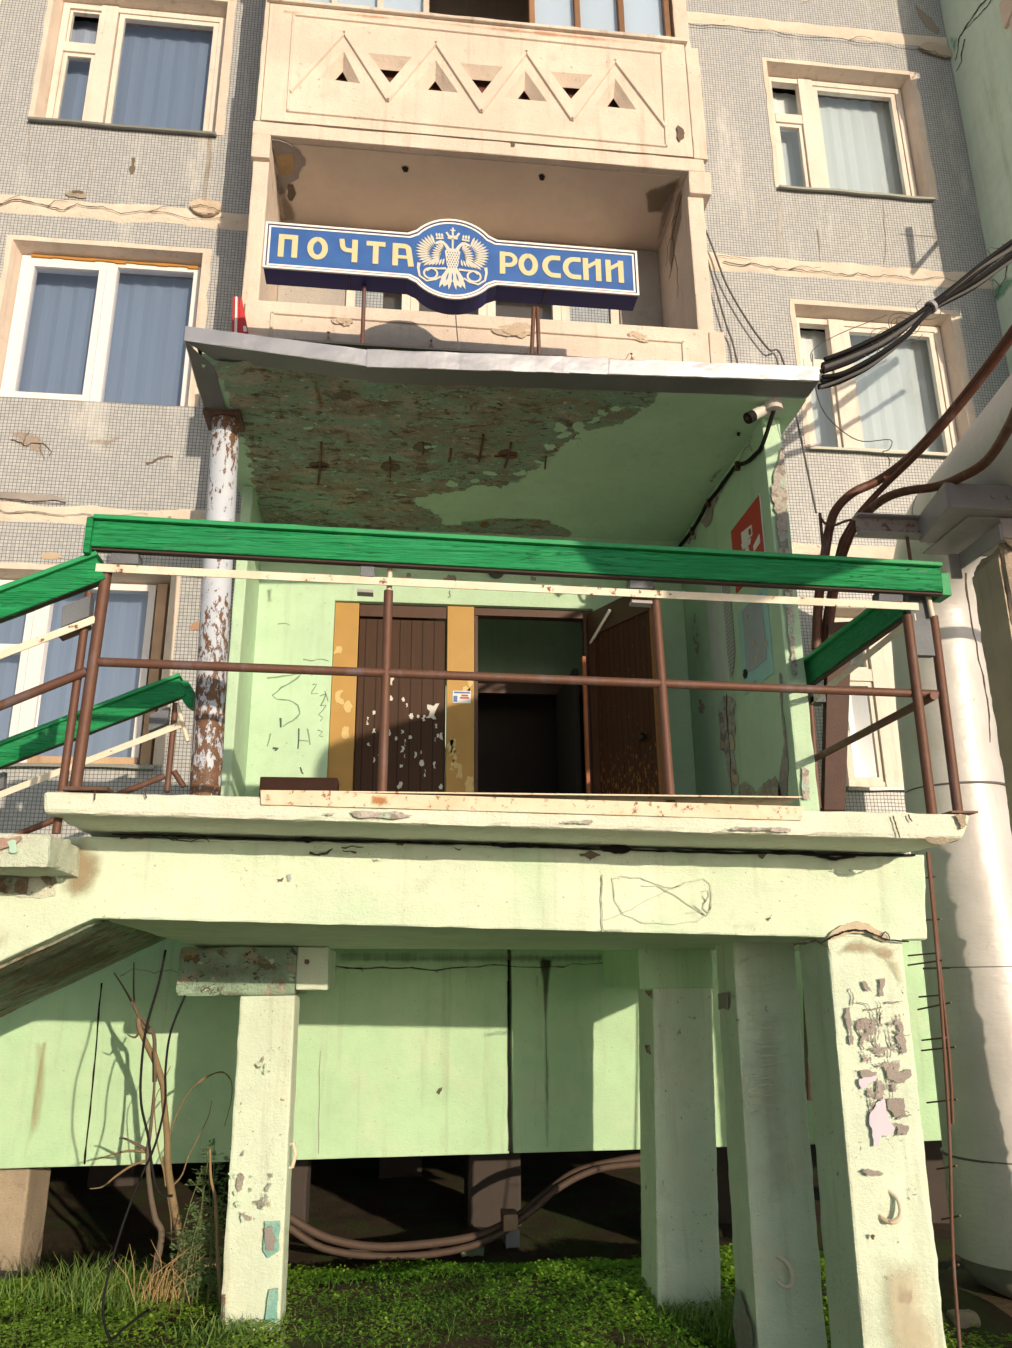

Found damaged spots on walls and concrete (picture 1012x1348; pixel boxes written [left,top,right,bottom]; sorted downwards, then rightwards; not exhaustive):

spalling [272,139,305,201]
peeling [214,360,659,537]
peeling [771,435,789,553]
peeling [722,586,767,677]
peeling [698,693,738,796]
peeling [778,589,810,800]
damp [541,960,550,1017]
spalling [843,814,967,1348]
peeling [732,1287,753,1348]